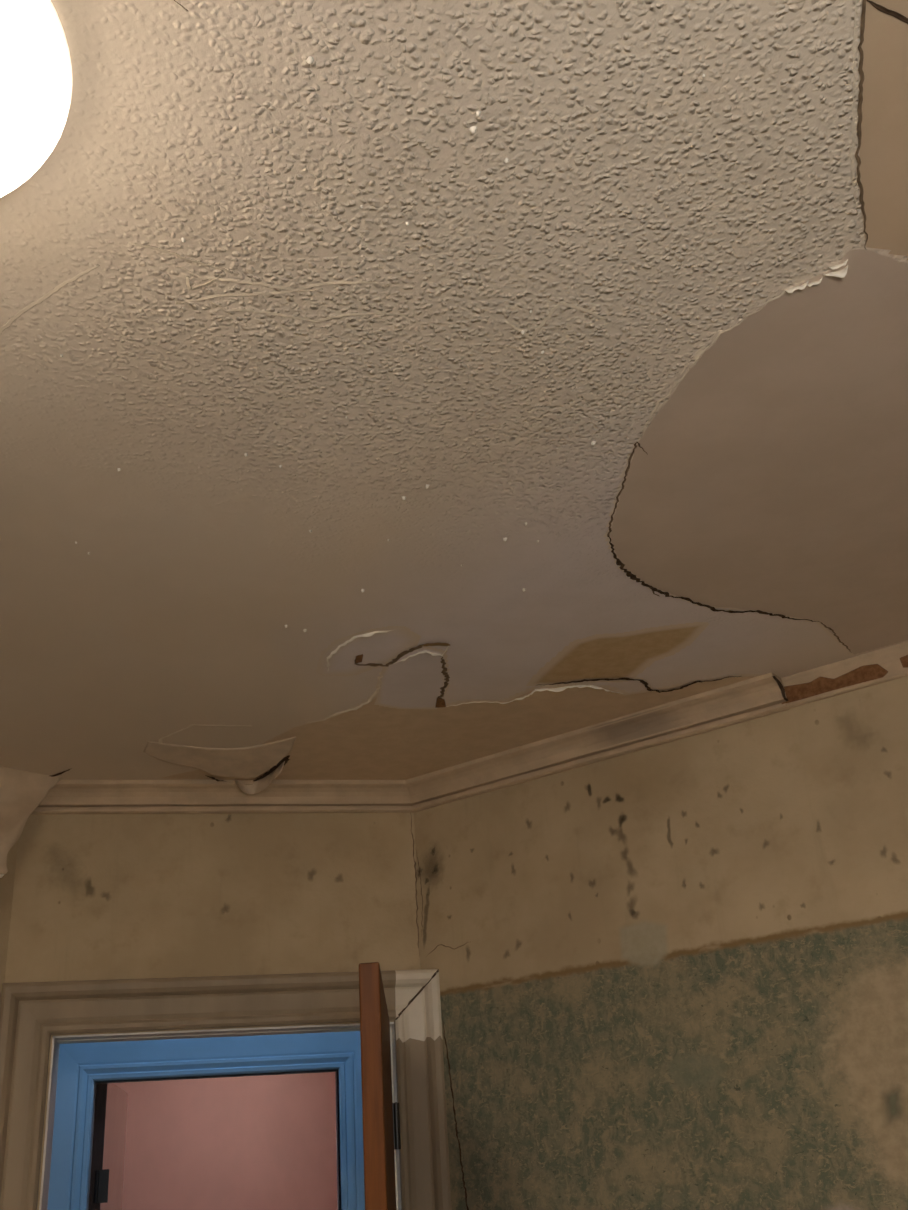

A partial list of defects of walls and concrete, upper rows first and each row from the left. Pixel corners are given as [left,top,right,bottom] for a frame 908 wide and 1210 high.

peeling [154,0,908,780]